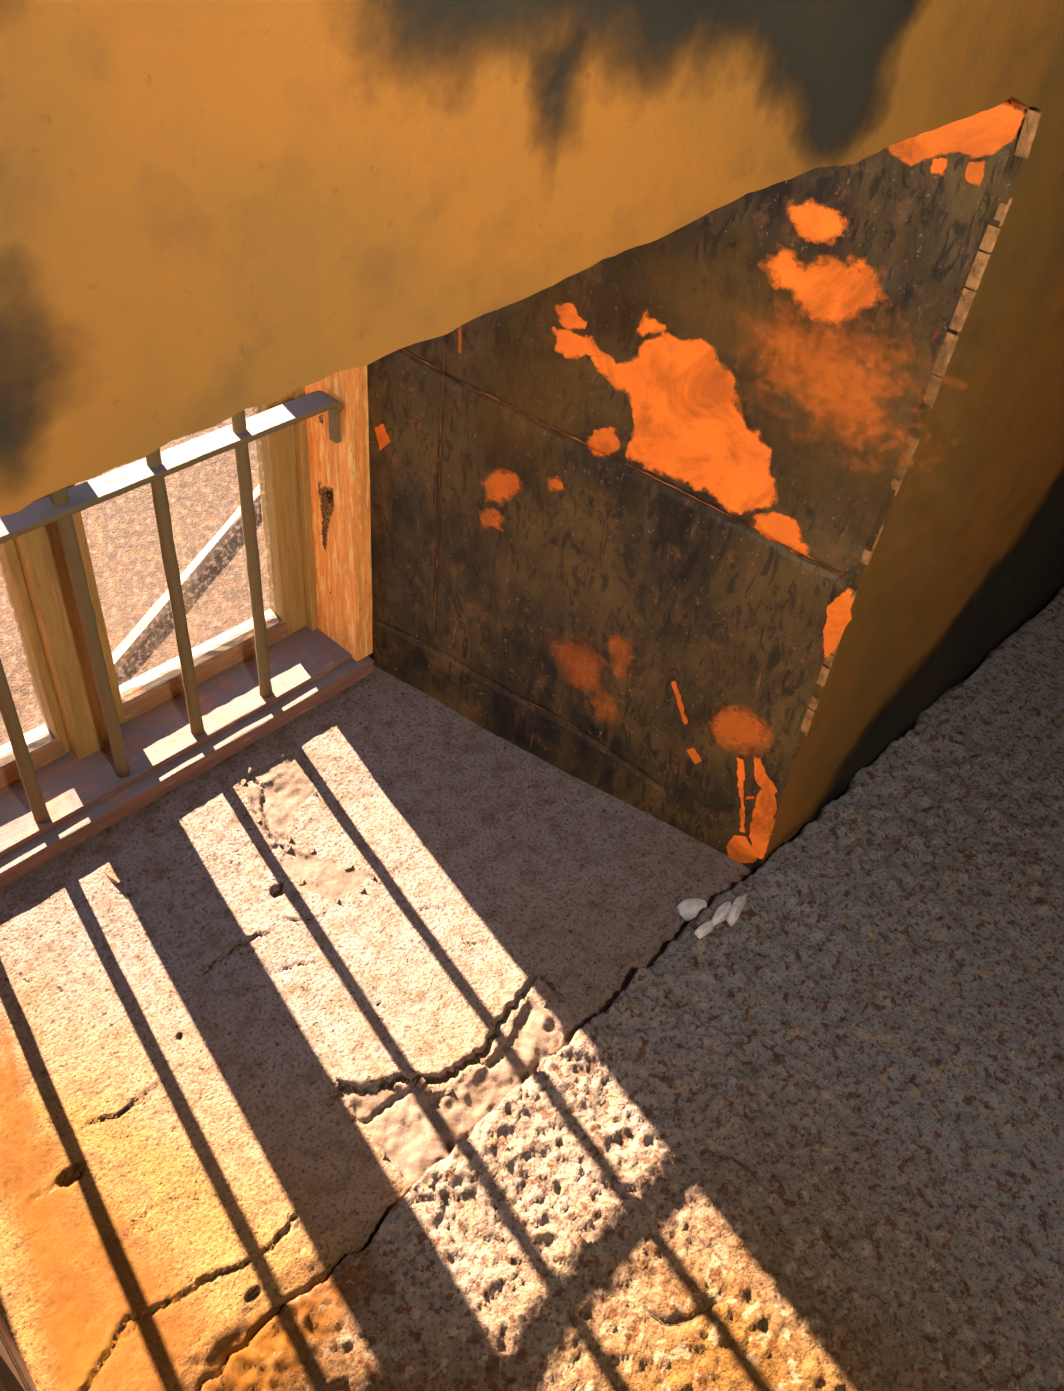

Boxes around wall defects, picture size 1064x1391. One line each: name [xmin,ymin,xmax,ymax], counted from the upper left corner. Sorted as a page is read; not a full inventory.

crack [338,974,565,1125]
crack [82,1203,300,1391]